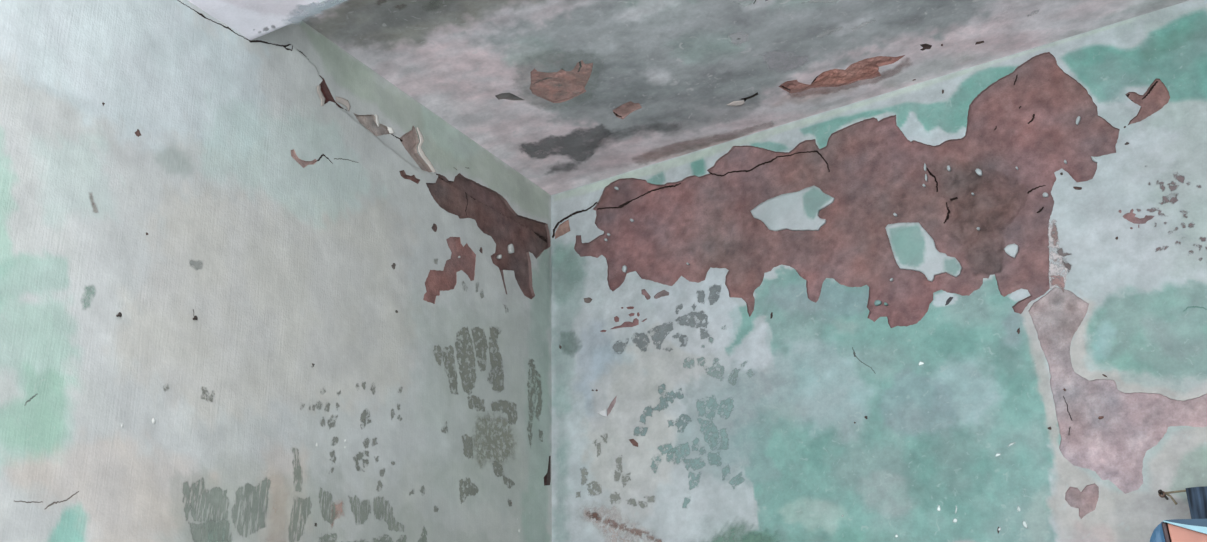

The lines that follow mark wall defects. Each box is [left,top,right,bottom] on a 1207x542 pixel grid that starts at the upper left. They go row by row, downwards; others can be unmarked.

flaking render [317,52,1207,519]
peeling [183,478,271,542]
peeling [289,448,337,542]
peeling [302,390,341,472]
peeling [349,410,427,542]